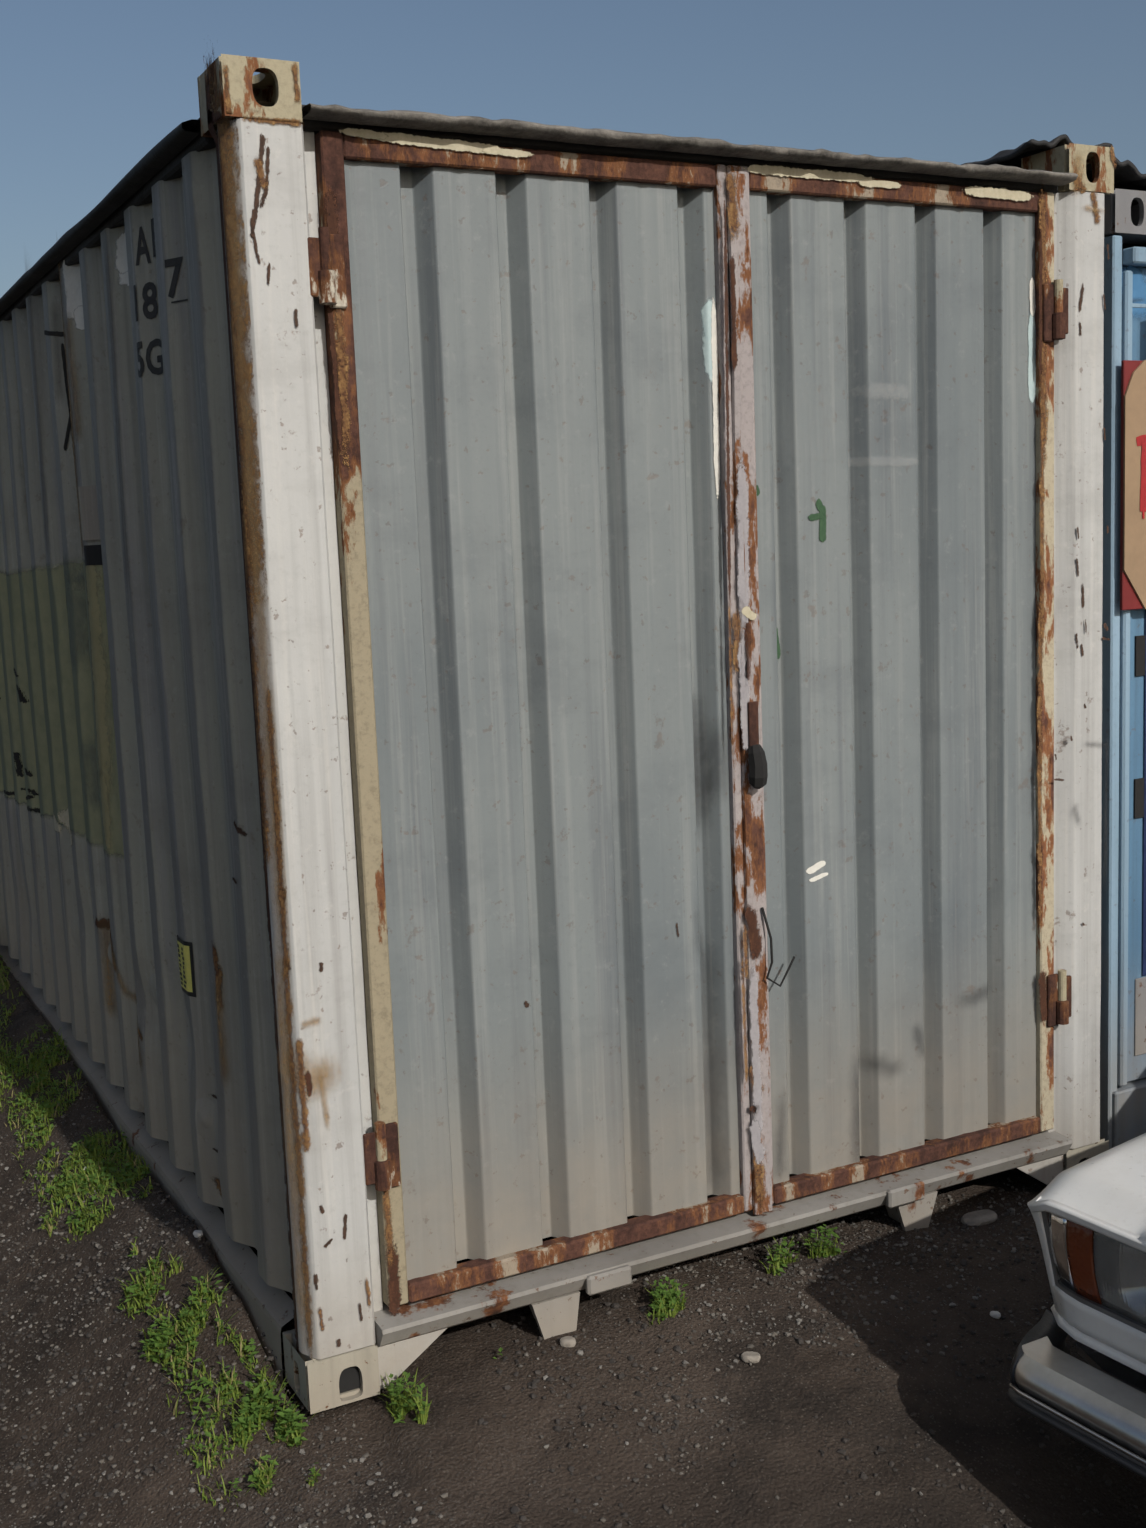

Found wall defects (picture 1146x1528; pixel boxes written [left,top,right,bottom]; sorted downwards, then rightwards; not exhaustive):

corrosion [327,305,350,466]
corrosion [724,173,757,744]
corrosion [1037,187,1049,925]
peeling [14,752,39,799]
corrosion [203,50,328,1360]
corrosion [741,904,764,1113]
corrosion [383,1190,402,1316]
corrosion [753,1154,765,1205]